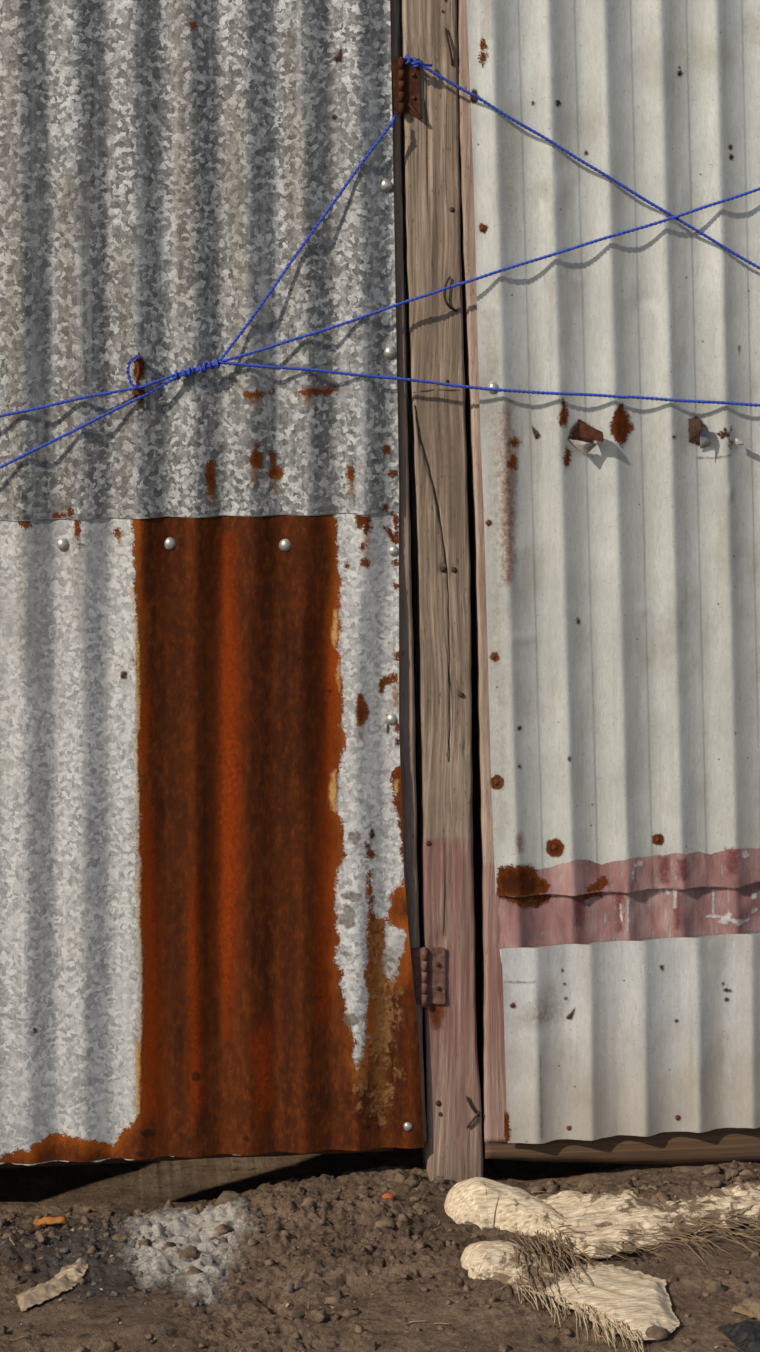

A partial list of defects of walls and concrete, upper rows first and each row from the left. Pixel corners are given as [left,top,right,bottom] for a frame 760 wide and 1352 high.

corrosion [243,388,276,403]
corrosion [298,386,339,401]
corrosion [557,398,569,428]
corrosion [609,403,634,448]
corrosion [205,458,218,499]
corrosion [249,436,286,493]
corrosion [382,445,398,479]
corrosion [0,503,447,1164]
corrosion [546,838,564,857]
corrosion [496,864,551,908]
corrosion [583,876,609,899]